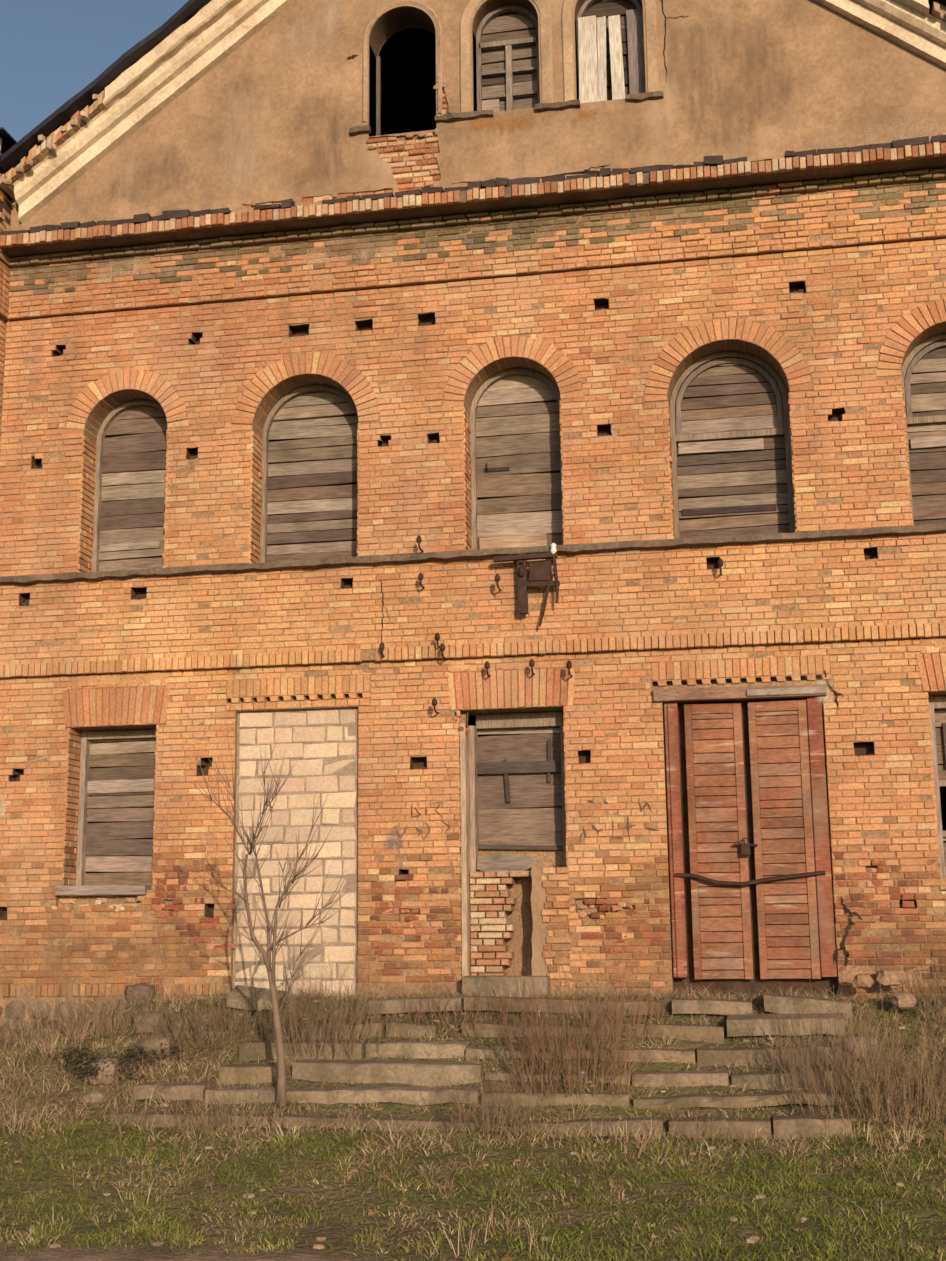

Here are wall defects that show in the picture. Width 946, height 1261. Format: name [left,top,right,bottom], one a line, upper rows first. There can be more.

crack [661,0,687,83]
flaking render [243,78,449,208]